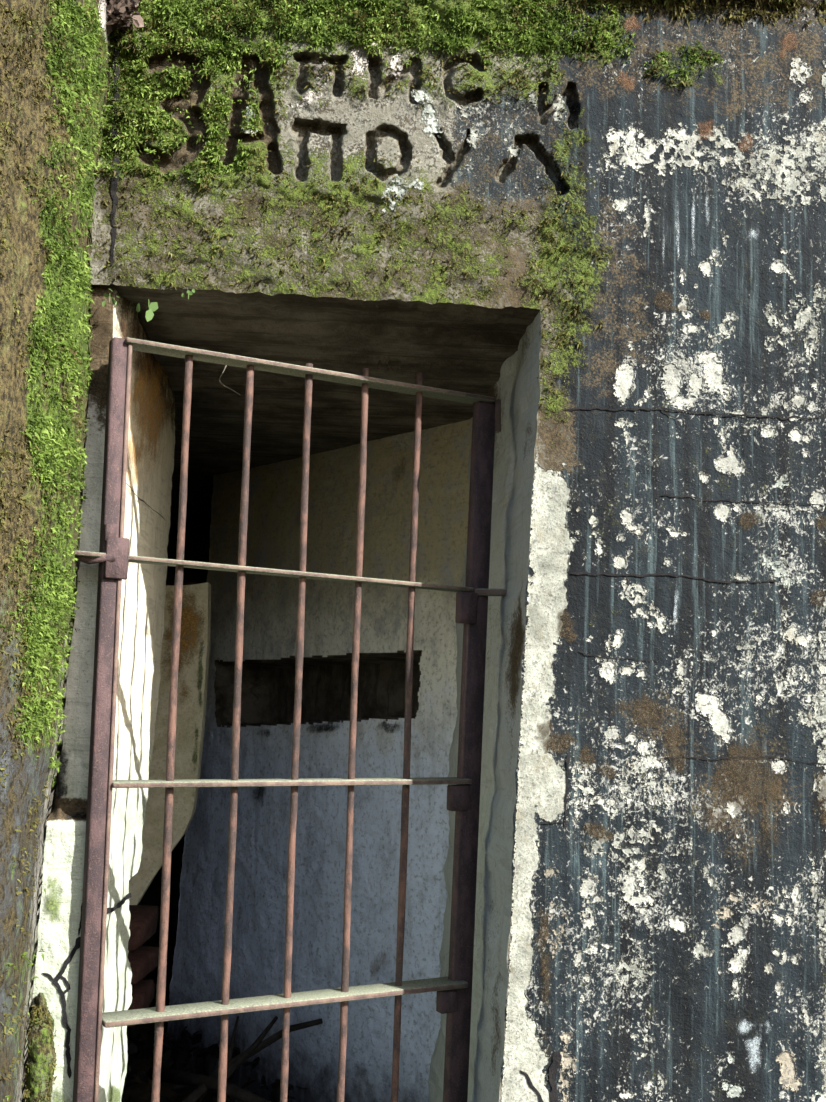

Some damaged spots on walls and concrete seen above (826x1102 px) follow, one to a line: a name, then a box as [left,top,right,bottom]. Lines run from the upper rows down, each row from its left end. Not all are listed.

peeling [790,56,826,104]
peeling [603,116,826,207]
peeling [613,235,826,484]
damp [537,722,615,778]
peeling [501,446,693,1102]
peeling [672,660,735,743]
damp [713,746,781,832]
peeling [735,616,826,831]
peeling [693,851,826,1001]
crack [42,893,131,1079]
peeling [718,1052,746,1098]
peeling [775,1041,826,1102]